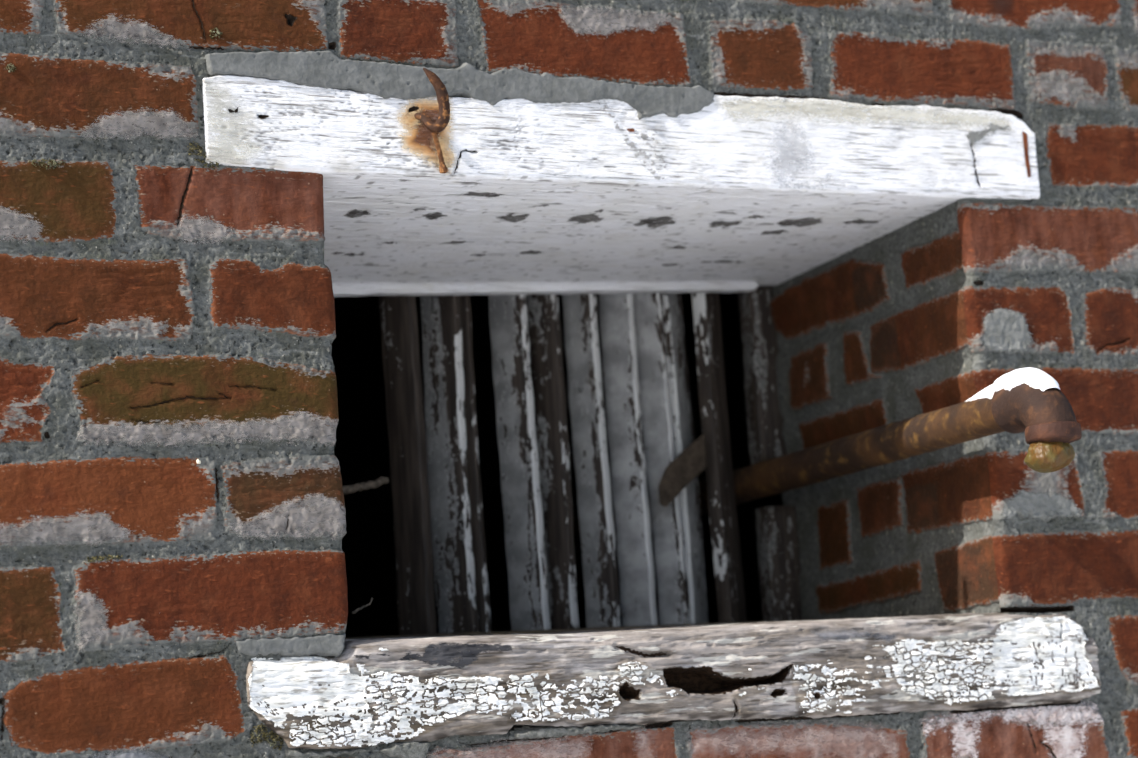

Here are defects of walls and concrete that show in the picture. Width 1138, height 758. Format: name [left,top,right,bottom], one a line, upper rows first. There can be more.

corrosion [398,99,455,168]
crack [177,168,192,225]
peeling [248,656,682,747]
peeling [793,616,1100,714]